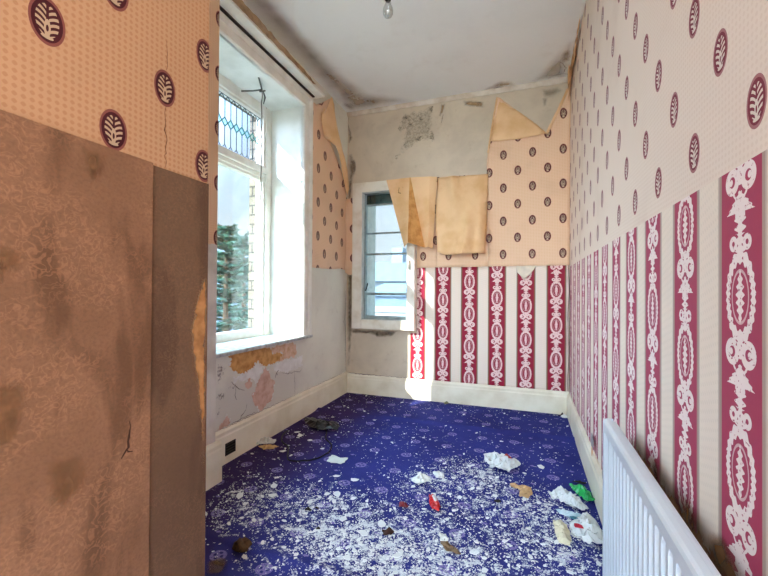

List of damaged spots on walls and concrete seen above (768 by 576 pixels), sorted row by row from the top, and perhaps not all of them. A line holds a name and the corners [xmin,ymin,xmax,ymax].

flaking render [228,342,303,412]
crack [121,421,133,459]